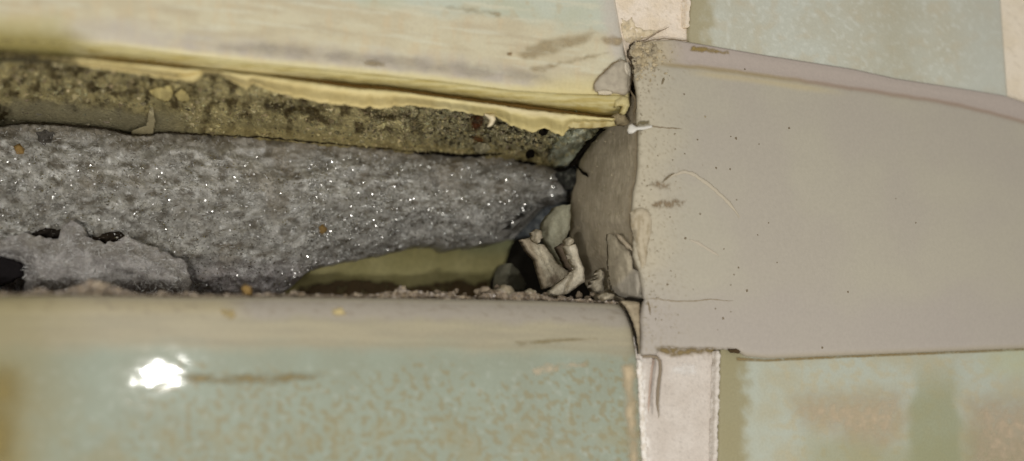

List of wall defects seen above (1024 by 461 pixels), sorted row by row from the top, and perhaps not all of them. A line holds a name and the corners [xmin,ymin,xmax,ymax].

peeling [0,52,630,168]